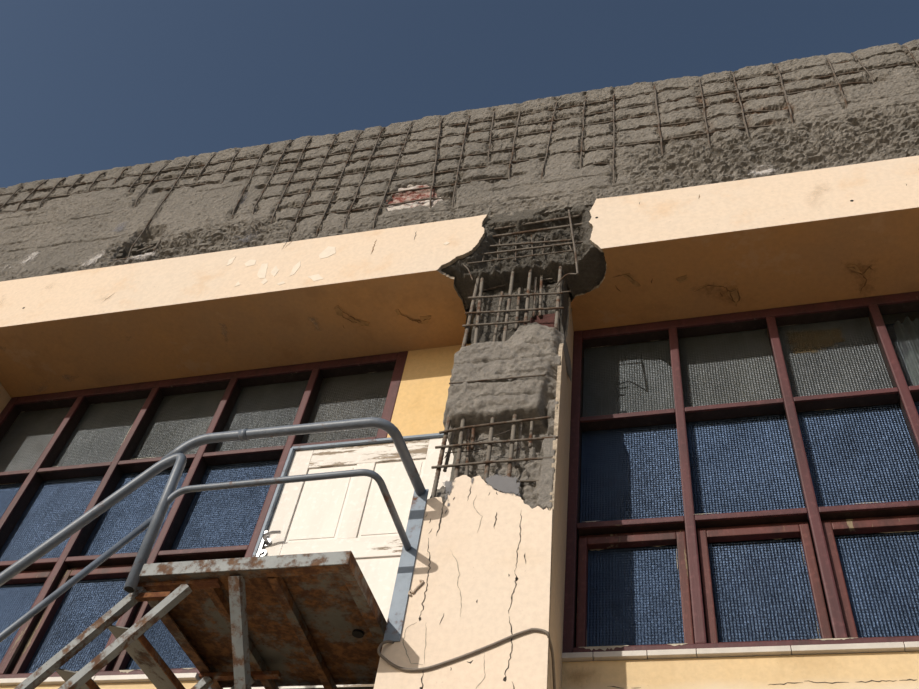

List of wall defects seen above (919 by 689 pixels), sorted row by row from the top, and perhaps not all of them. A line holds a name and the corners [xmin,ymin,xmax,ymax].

spalling [0,39,919,510]
crack [403,538,431,689]
crack [476,514,522,689]